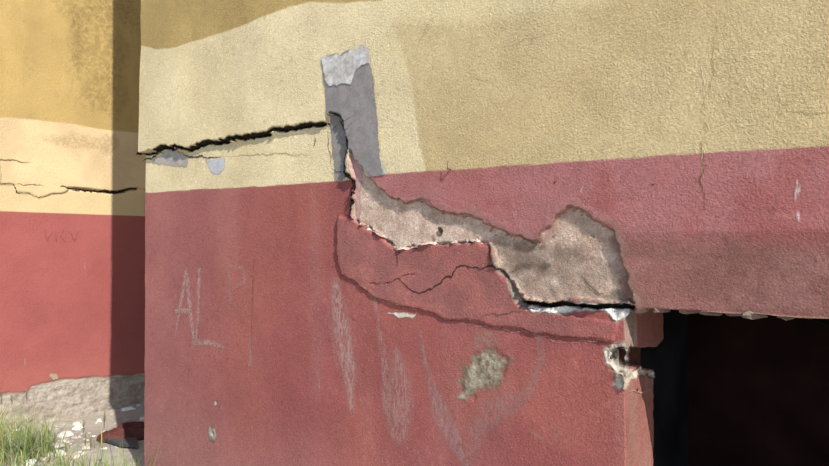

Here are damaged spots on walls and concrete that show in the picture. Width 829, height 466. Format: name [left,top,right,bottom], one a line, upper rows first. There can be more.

crack [699,20,722,208]
crack [0,159,137,197]
peeling [152,150,188,167]
peeling [206,158,225,175]
crack [136,112,635,344]
spalling [349,154,794,321]
peeling [458,333,509,399]
spalling [604,342,655,389]
spalling [0,373,145,428]